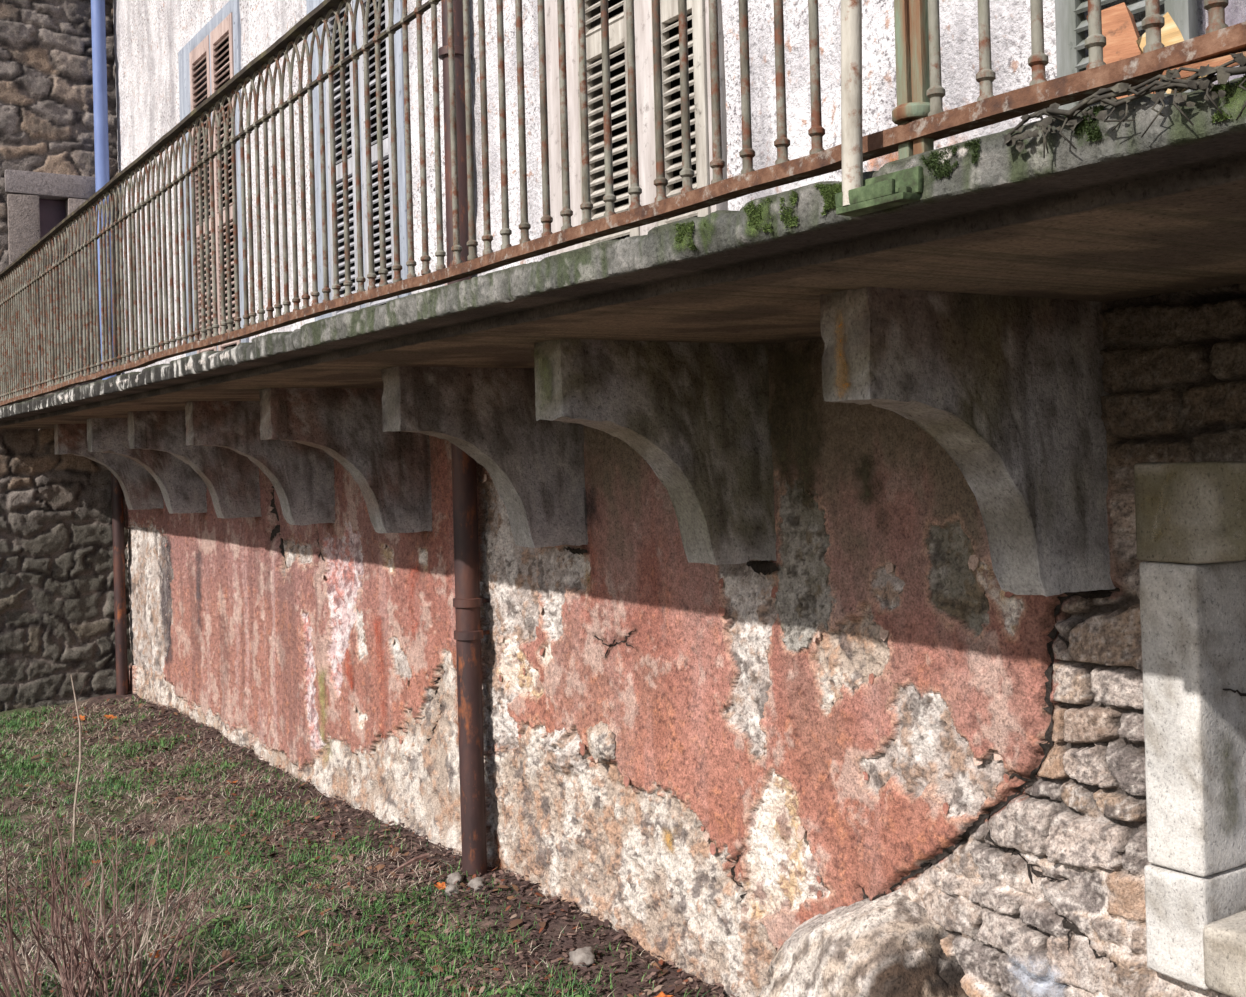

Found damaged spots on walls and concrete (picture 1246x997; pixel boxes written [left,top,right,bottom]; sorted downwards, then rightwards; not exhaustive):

rust [869,153,898,168]
peeling [127,522,462,856]
crack [594,629,636,658]
peeling [480,474,830,997]
peeling [718,480,905,760]
peeling [861,686,1010,816]
peeling [927,523,1021,634]
crack [862,588,1120,968]
crack [1223,688,1246,696]